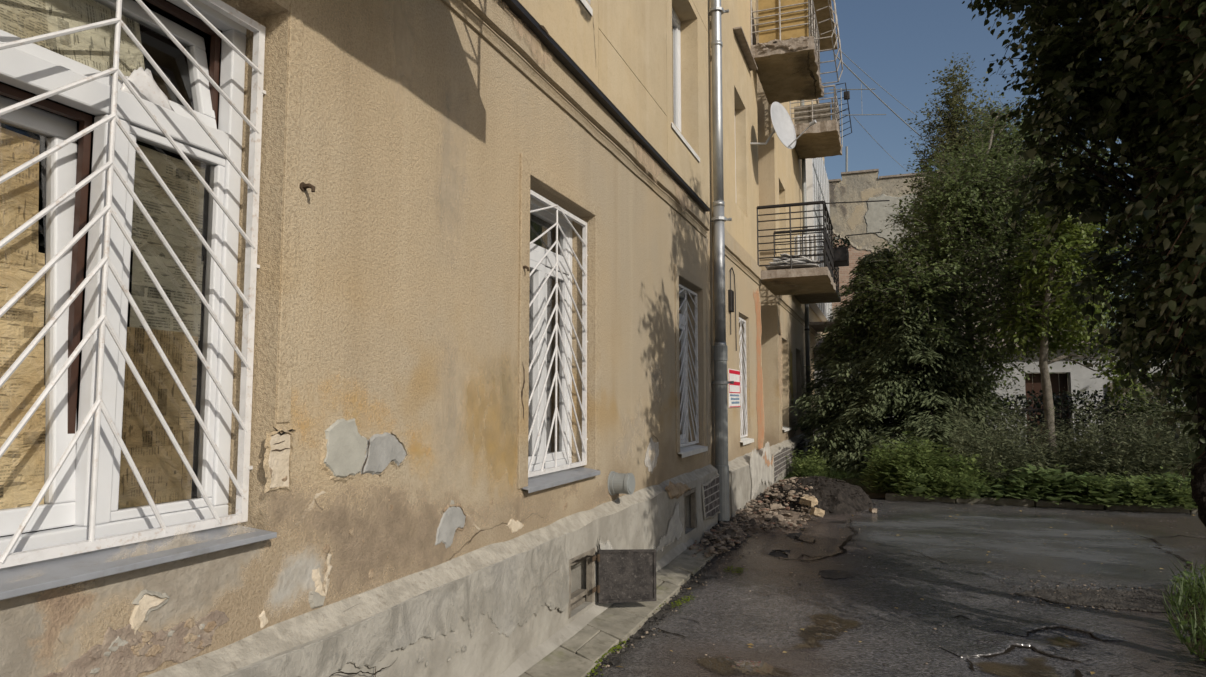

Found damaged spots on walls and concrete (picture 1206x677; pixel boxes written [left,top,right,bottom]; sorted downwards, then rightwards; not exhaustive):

flaking render [263,427,295,494]
peeling [644,436,660,474]
flaking render [31,587,229,677]